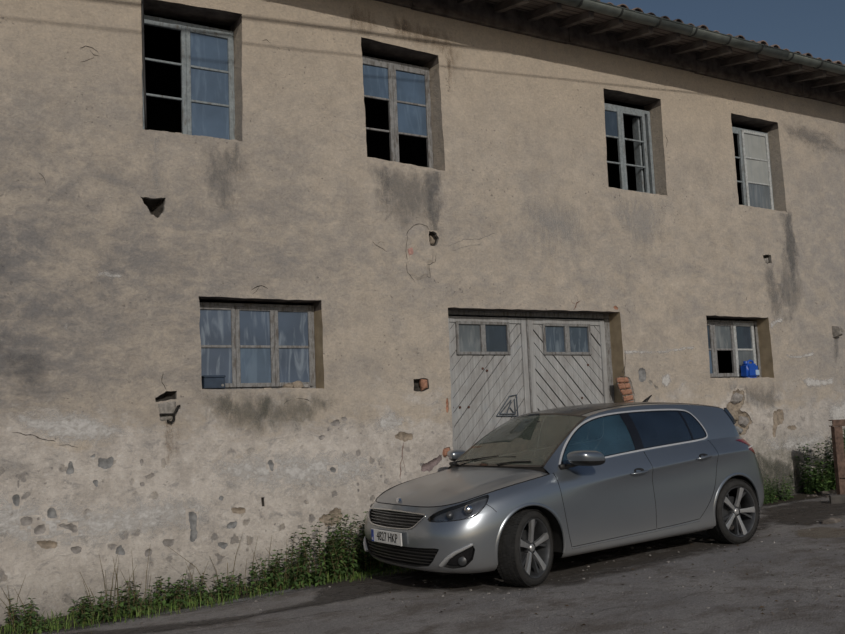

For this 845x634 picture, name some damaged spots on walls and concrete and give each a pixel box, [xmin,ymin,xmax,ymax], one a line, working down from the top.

flaking render [615,368,670,402]
spalling [726,389,752,435]
flaking render [829,400,845,422]
spalling [395,432,413,442]
flaking render [771,409,824,451]
spalling [421,447,451,472]
spalling [319,508,343,527]